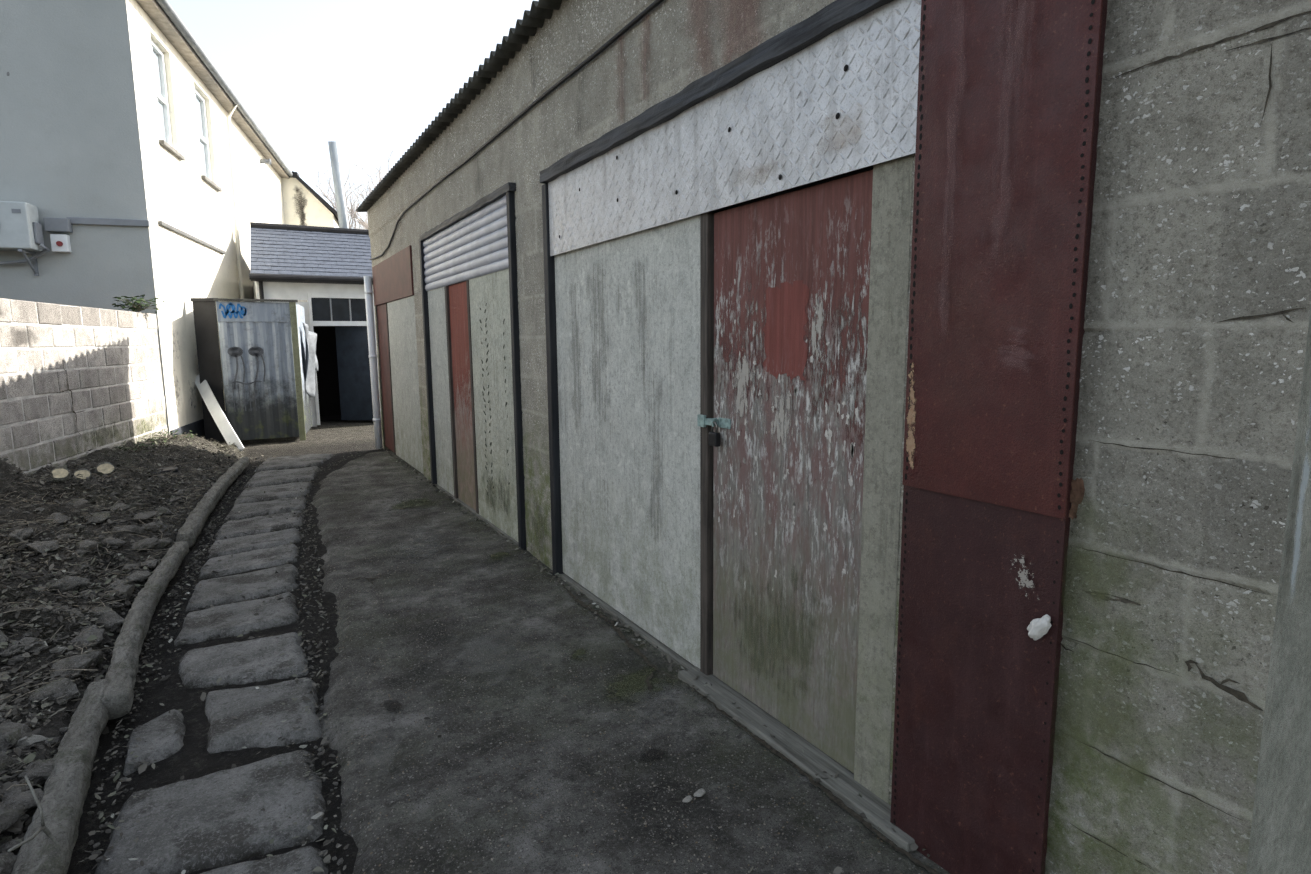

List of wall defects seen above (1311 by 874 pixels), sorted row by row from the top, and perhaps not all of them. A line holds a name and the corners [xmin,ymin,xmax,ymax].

crack [1104,11,1311,125]
crack [1219,308,1305,323]
peeling [716,315,797,522]
peeling [808,293,858,486]
rust [906,363,916,469]
crack [1060,635,1263,711]